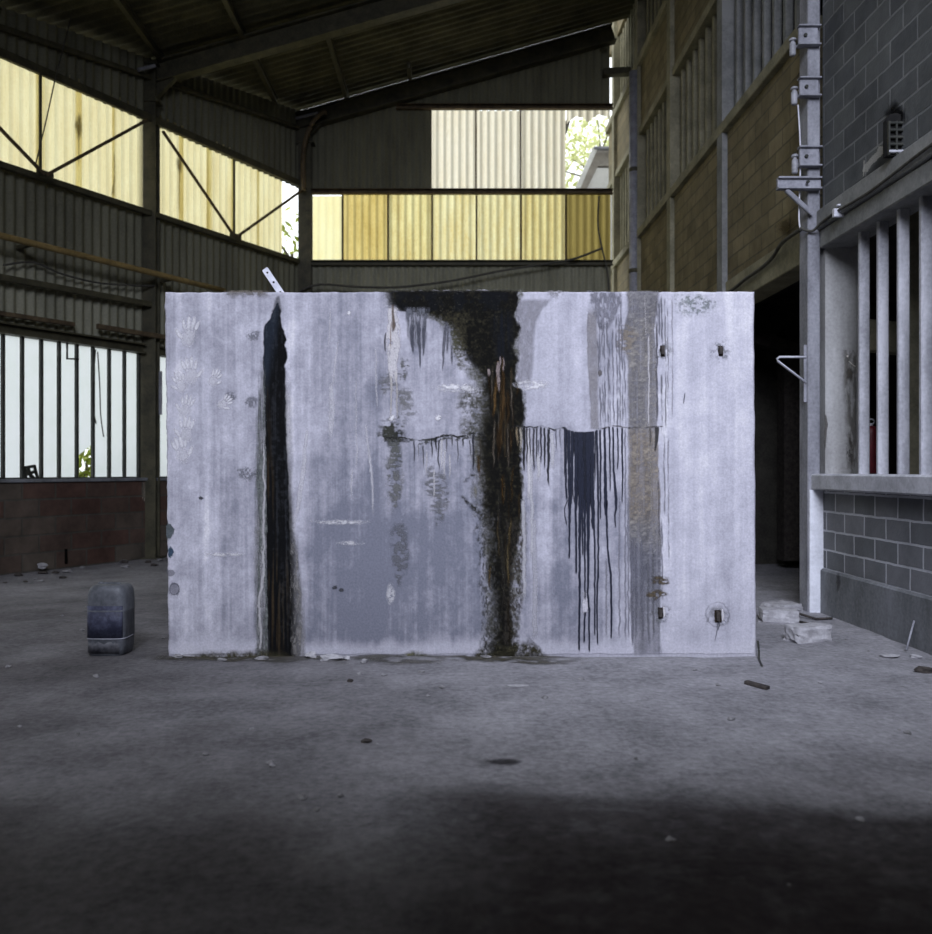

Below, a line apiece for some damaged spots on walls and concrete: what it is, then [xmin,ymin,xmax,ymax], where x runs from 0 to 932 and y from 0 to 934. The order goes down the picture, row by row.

water stain [256,302,308,657]
water stain [375,290,560,656]
water stain [587,292,663,640]
water stain [648,298,673,545]